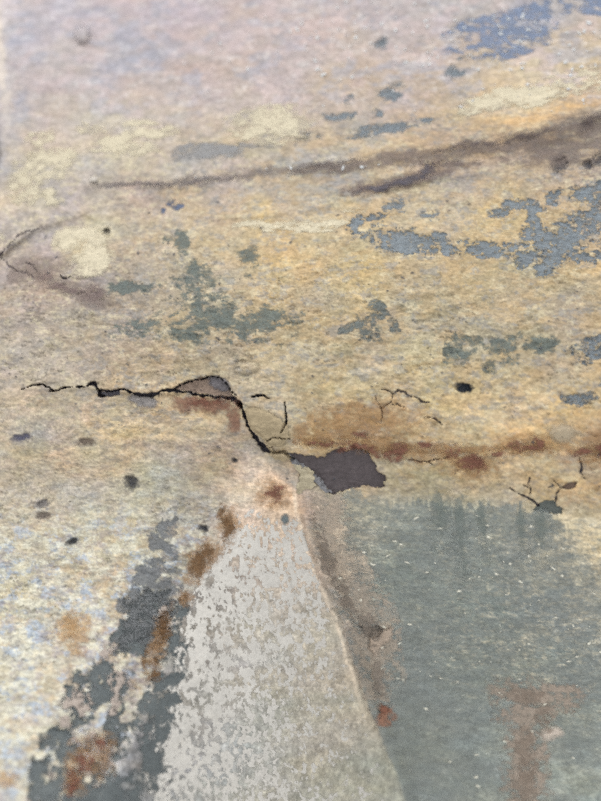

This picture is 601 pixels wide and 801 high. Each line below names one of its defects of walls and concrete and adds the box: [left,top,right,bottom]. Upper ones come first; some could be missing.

peeling [441,0,601,80]
water stain [296,112,601,196]
crack [0,228,39,278]
peeling [232,180,601,277]
crack [22,376,290,453]
peeling [246,407,386,588]
corrosion [309,432,407,462]
corrosion [447,449,487,471]
corrosion [492,438,544,457]
corrosion [142,657,161,680]
flaking render [27,509,383,801]
water stain [310,489,601,801]